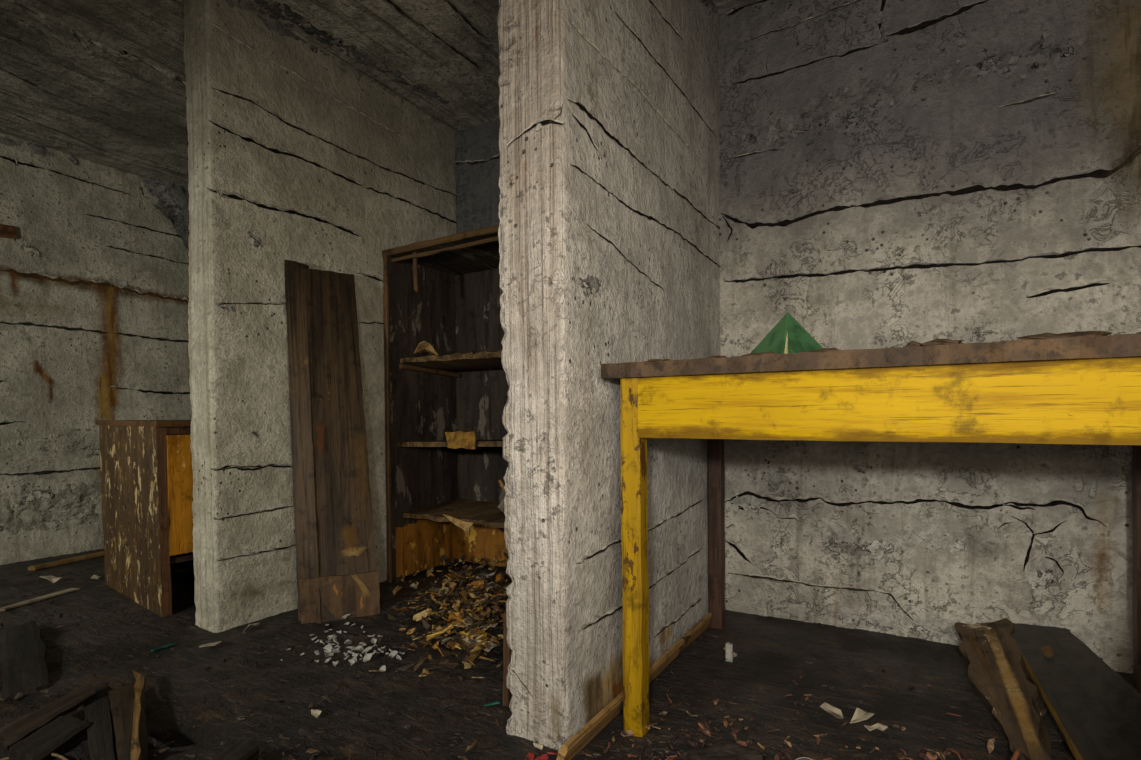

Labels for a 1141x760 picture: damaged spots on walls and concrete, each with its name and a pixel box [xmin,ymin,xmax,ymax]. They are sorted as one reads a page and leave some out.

crack [726,0,988,85]
rust [0,224,17,239]
crack [507,99,1141,290]
crack [1026,280,1110,298]
rust [0,268,189,420]
crack [725,490,1109,582]